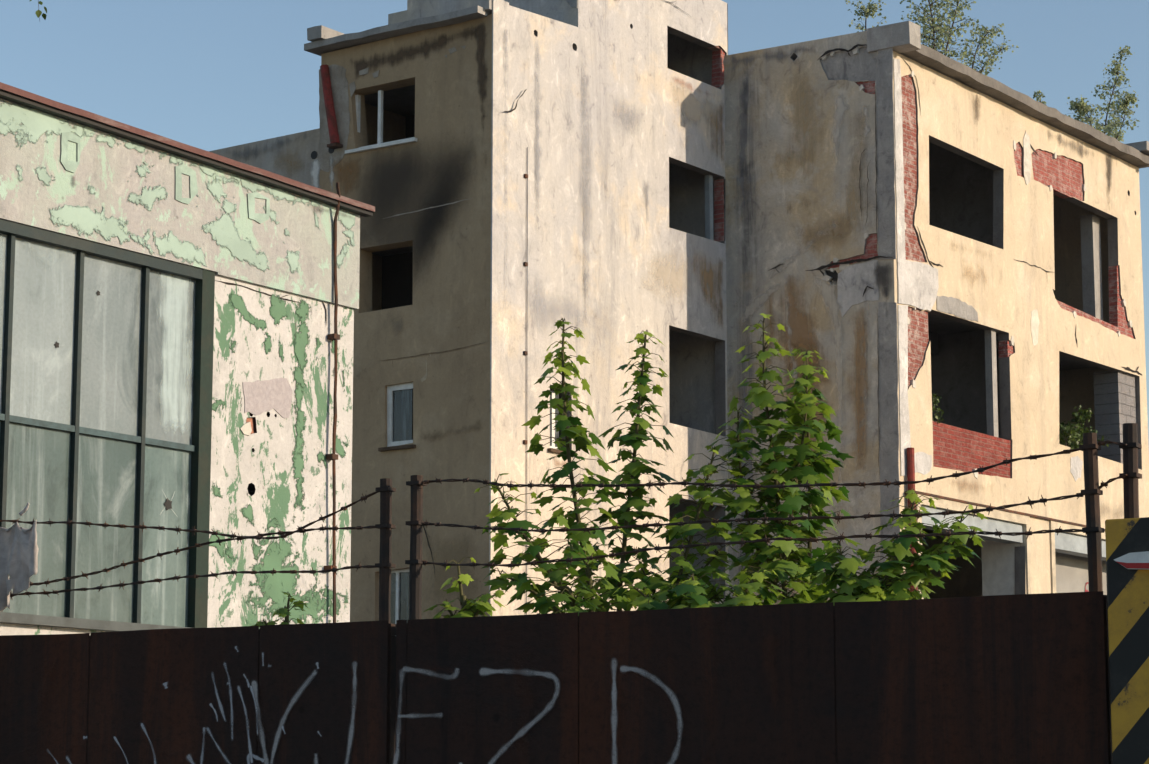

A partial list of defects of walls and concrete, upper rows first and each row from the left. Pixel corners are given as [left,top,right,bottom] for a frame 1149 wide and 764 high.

peeling [0,100,321,274]
flaking render [311,64,380,172]
water stain [355,25,486,100]
water stain [732,57,753,220]
crack [768,94,893,321]
flaking render [901,71,925,262]
flaking render [908,307,929,388]
crack [918,229,943,268]
flaking render [1013,140,1086,201]
flaking render [1057,265,1134,339]
peeling [228,291,349,624]
crack [874,348,882,473]